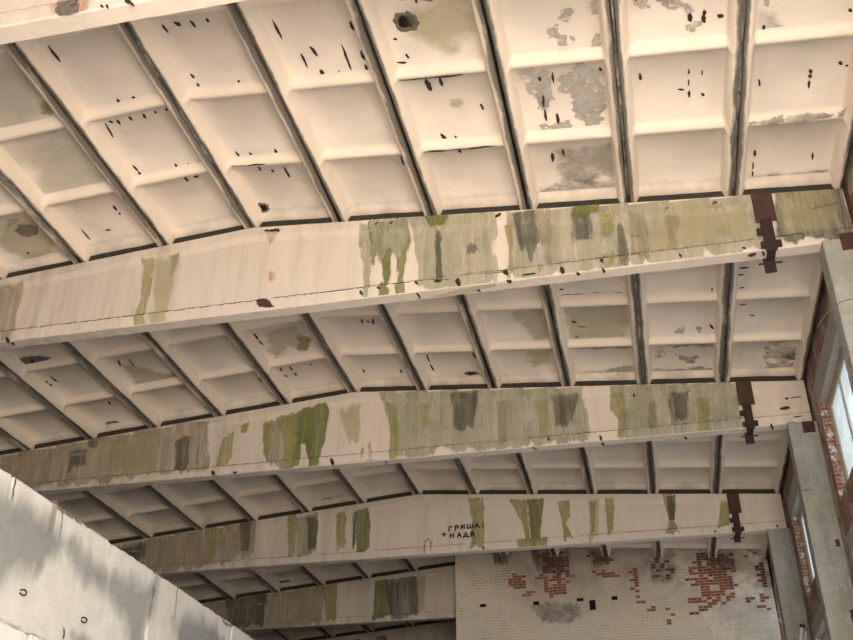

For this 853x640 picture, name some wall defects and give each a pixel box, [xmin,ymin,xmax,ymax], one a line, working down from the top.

peeling [633,0,706,32]
peeling [518,62,607,130]
leakage [359,211,498,297]
leakage [507,194,764,278]
leakage [775,188,853,244]
leakage [263,421,273,459]
leakage [284,403,329,469]
leakage [380,387,589,458]
leakage [610,382,740,439]
flaking render [508,551,574,598]
flaking render [586,552,675,625]
flaking render [685,550,772,615]